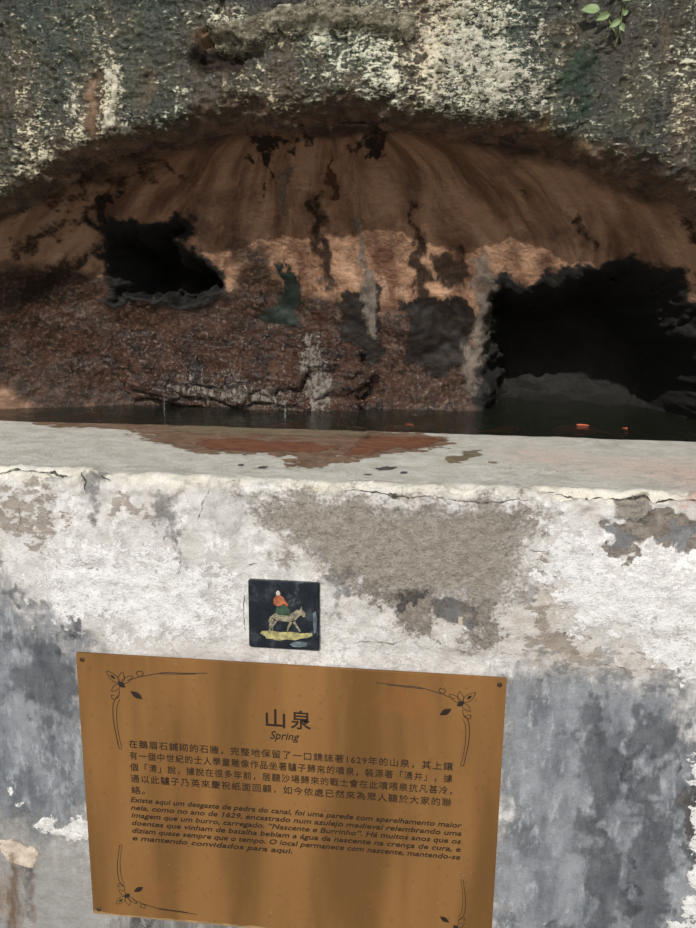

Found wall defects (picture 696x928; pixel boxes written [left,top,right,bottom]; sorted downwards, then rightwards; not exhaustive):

corrosion [32,422,483,469]
crack [1,468,108,490]
crack [344,481,696,504]
flaking render [245,487,696,688]
water stain [0,587,91,838]
peeling [685,752,696,786]
water stain [493,671,696,928]
peeling [33,815,88,842]
peeling [662,801,696,928]